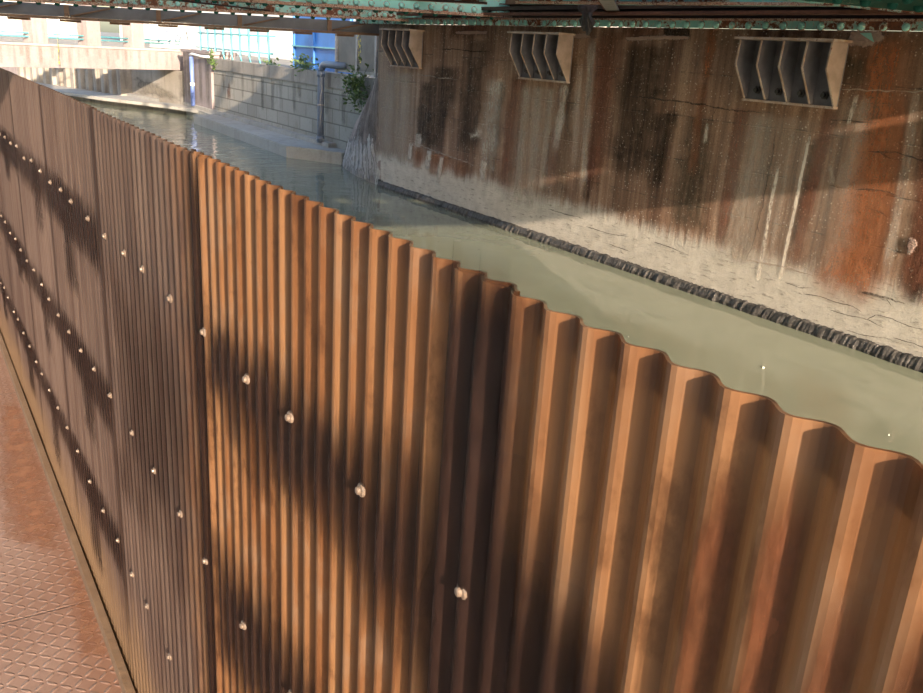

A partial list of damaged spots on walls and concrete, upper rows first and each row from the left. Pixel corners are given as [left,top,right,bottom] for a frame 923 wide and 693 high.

damp [408,45,503,183]
damp [757,171,779,278]
damp [780,143,816,273]
crack [745,137,923,347]
corrosion [191,186,217,693]
damp [211,339,434,667]
corrosion [427,312,515,693]